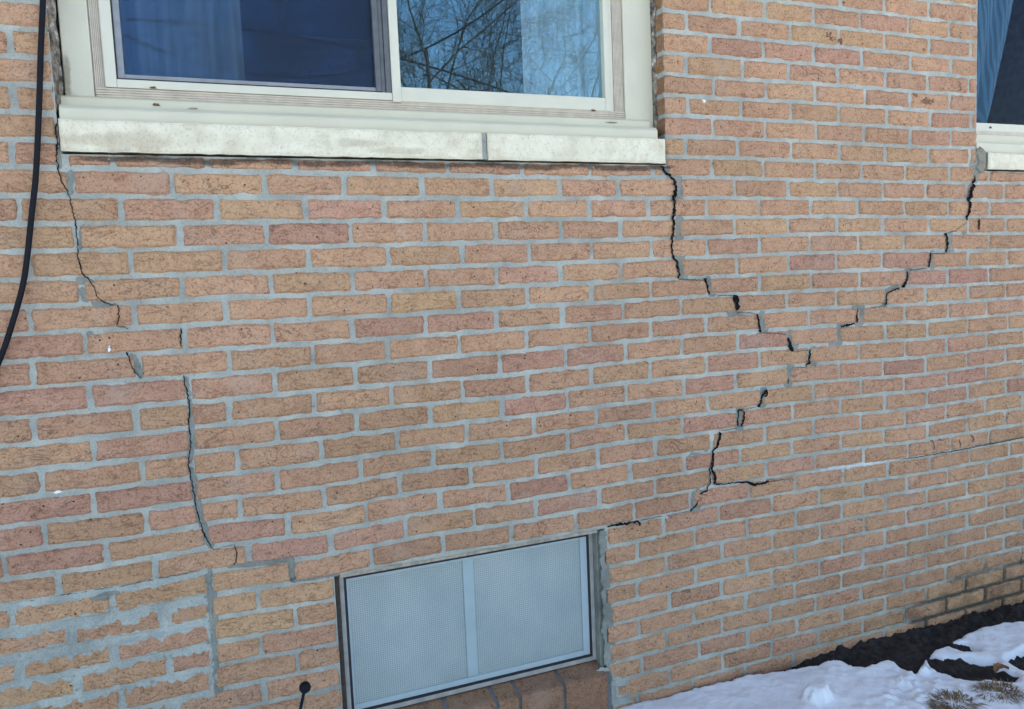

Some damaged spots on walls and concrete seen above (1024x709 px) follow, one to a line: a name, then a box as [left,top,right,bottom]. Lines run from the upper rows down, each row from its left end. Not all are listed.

crack [53,123,144,379]
crack [183,375,238,565]
crack [607,156,980,527]
crack [905,435,1024,459]